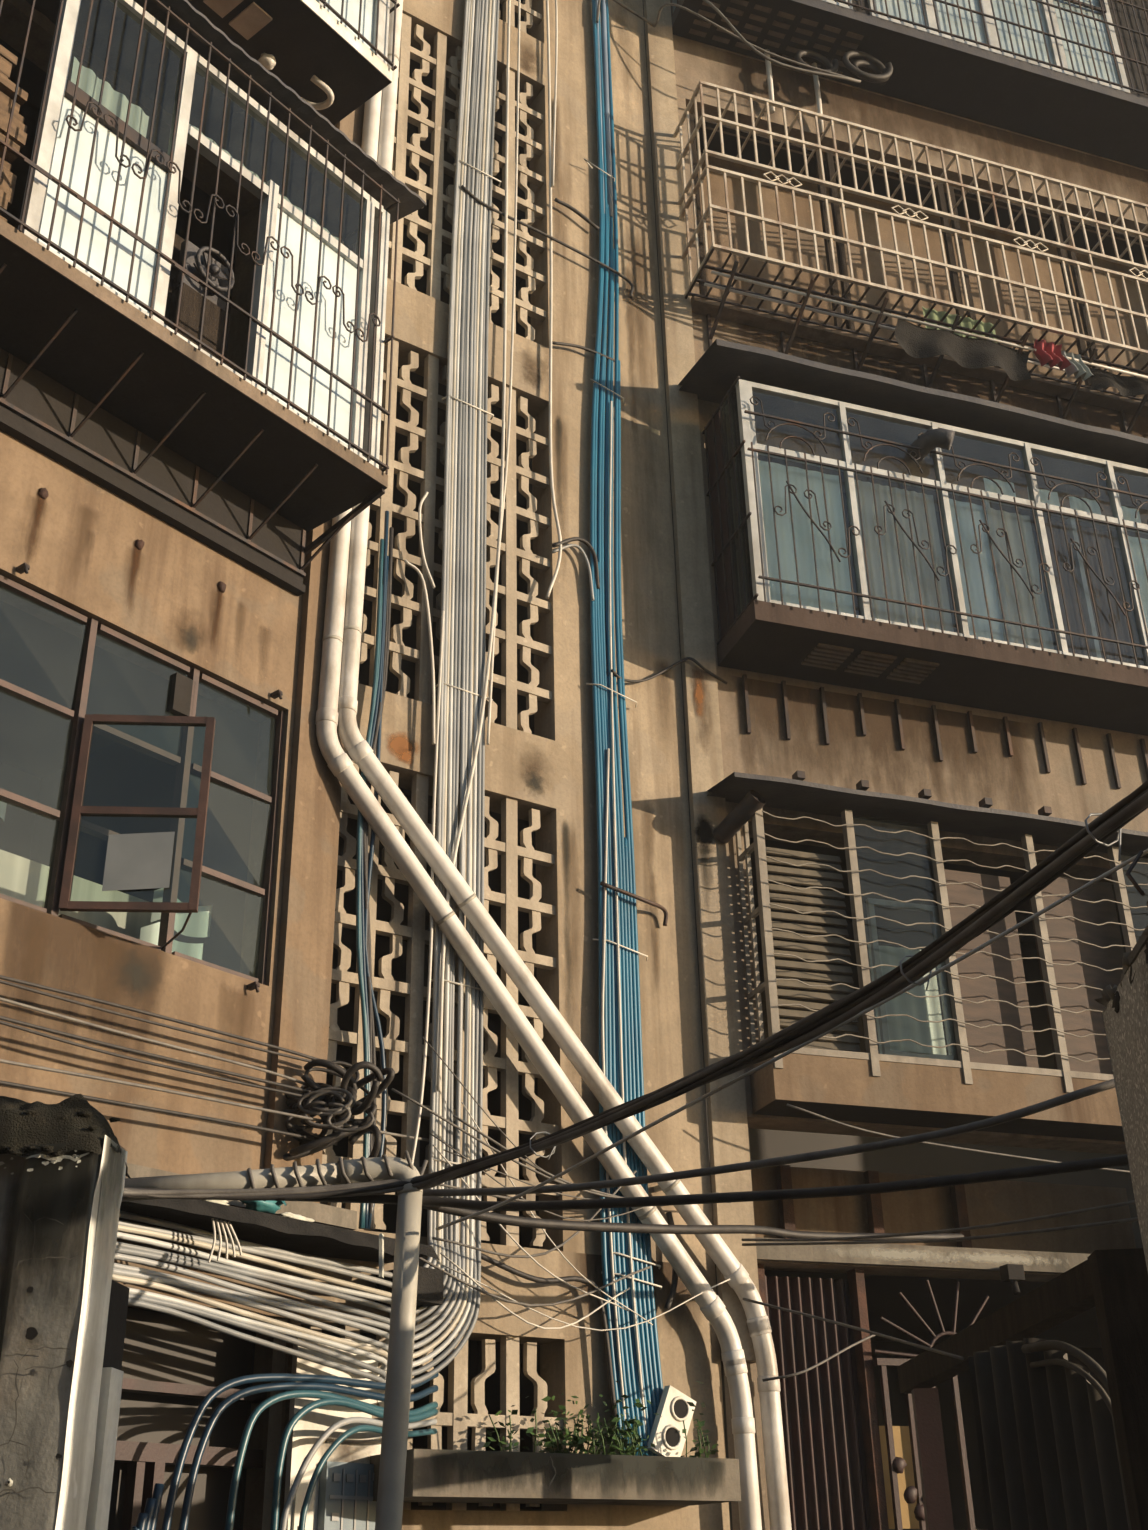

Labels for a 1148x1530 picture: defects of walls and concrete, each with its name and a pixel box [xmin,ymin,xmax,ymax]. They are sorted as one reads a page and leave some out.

rust [36,488,49,523]
rust [131,539,145,585]
rust [215,581,226,631]
rust [693,670,705,713]
rust [389,735,416,763]
peeling [0,1150,90,1175]
water stain [0,1137,126,1359]